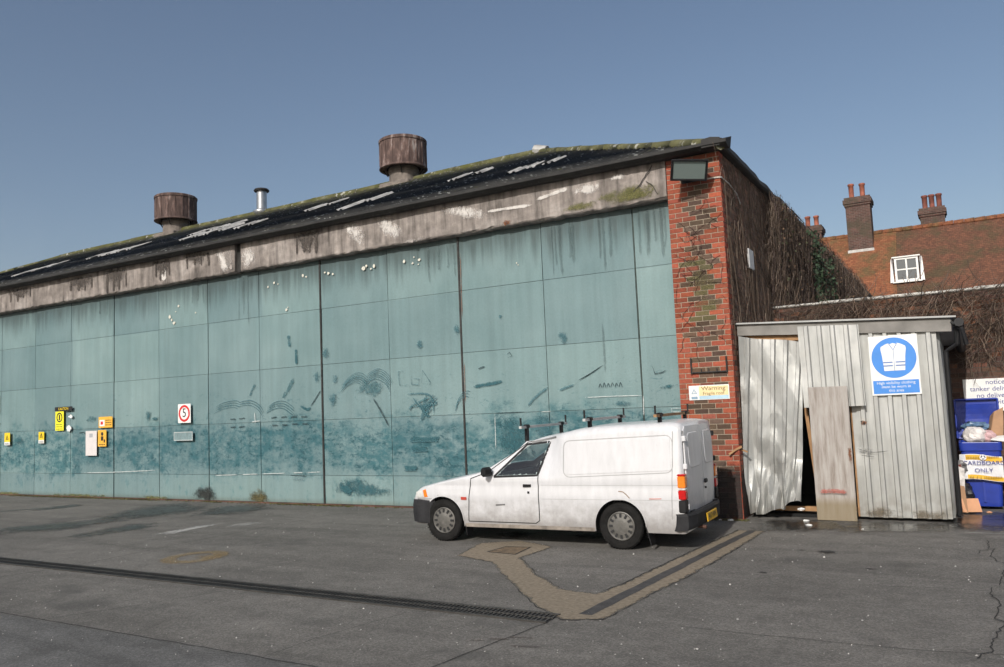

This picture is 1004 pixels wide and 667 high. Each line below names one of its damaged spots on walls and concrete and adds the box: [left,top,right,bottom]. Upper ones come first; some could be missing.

water stain [215,391,320,428]
crack [977,540,1004,658]